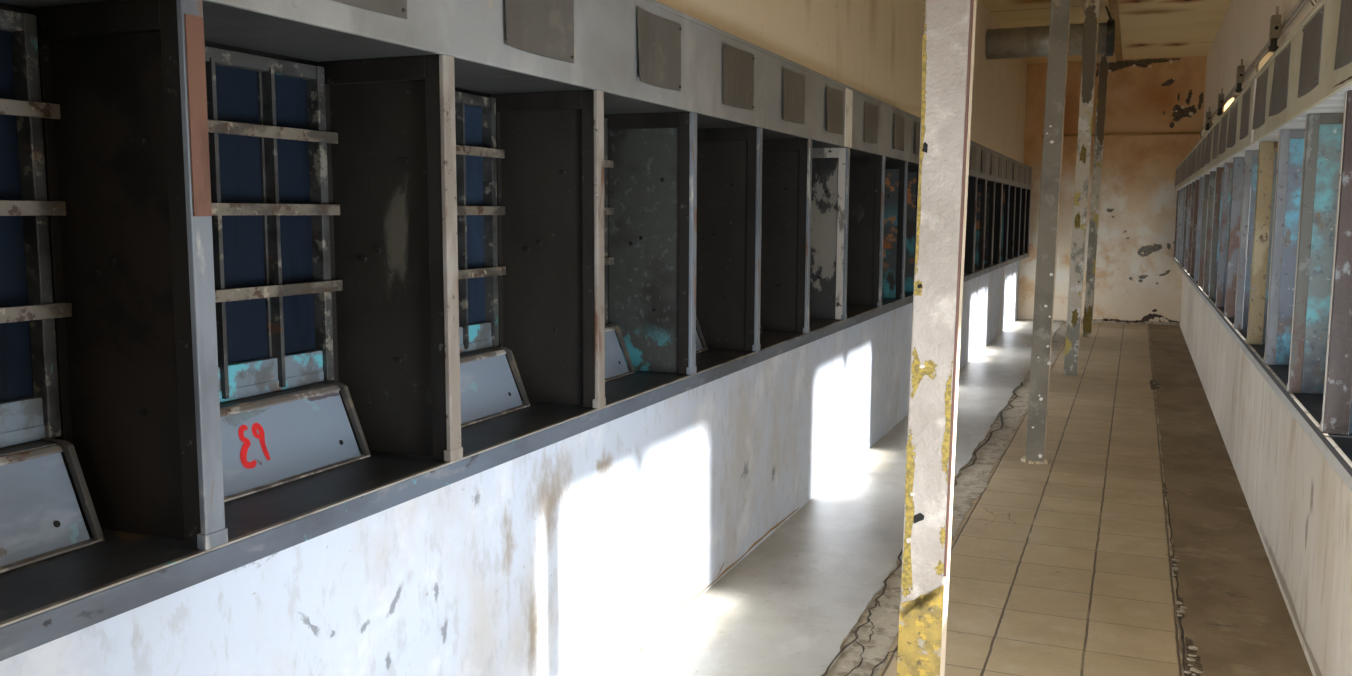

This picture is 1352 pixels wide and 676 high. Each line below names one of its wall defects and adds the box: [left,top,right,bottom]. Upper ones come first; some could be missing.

peeling [1079,1,1204,164]
peeling [1071,305,1093,336]
peeling [911,348,953,483]
crack [954,382,1023,486]
water stain [497,436,619,676]
crack [823,548,903,676]
peeling [897,429,946,676]